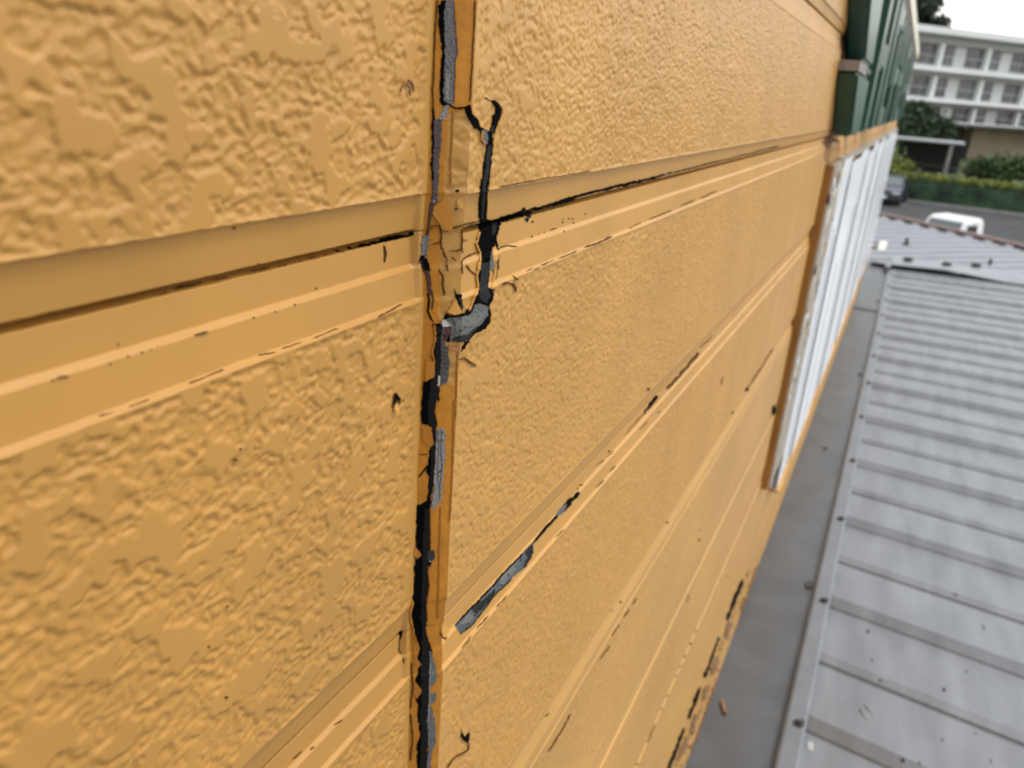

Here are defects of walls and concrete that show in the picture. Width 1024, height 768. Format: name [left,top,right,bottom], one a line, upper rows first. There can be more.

spalling [424,40,483,386]
crack [331,0,779,369]
peeling [422,426,433,448]
crack [418,430,443,499]
peeling [455,535,541,648]
crack [410,663,470,768]